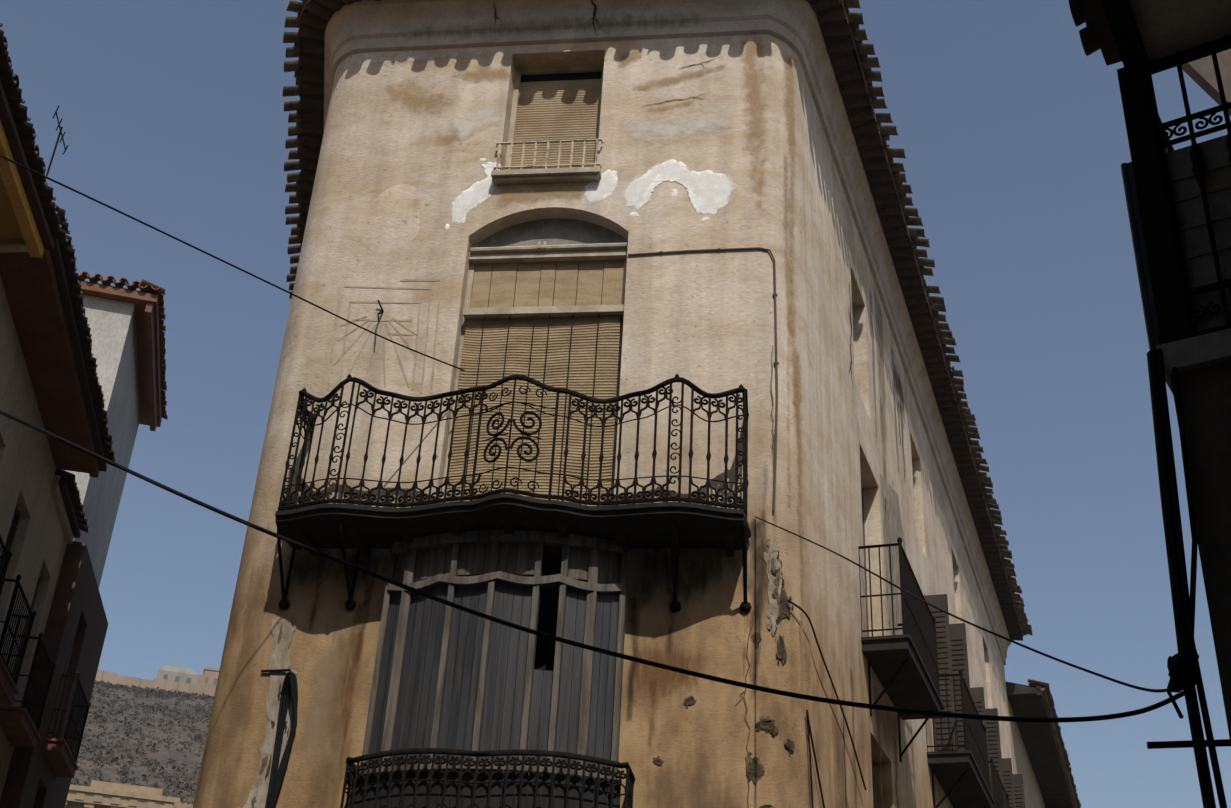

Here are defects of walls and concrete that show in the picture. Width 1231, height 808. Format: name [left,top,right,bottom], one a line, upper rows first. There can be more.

crack [591,0,600,34]
flaking render [751,539,794,665]
damp [629,648,637,700]
flaking render [238,616,298,808]
flaking render [755,715,795,753]
flaking render [745,752,765,787]